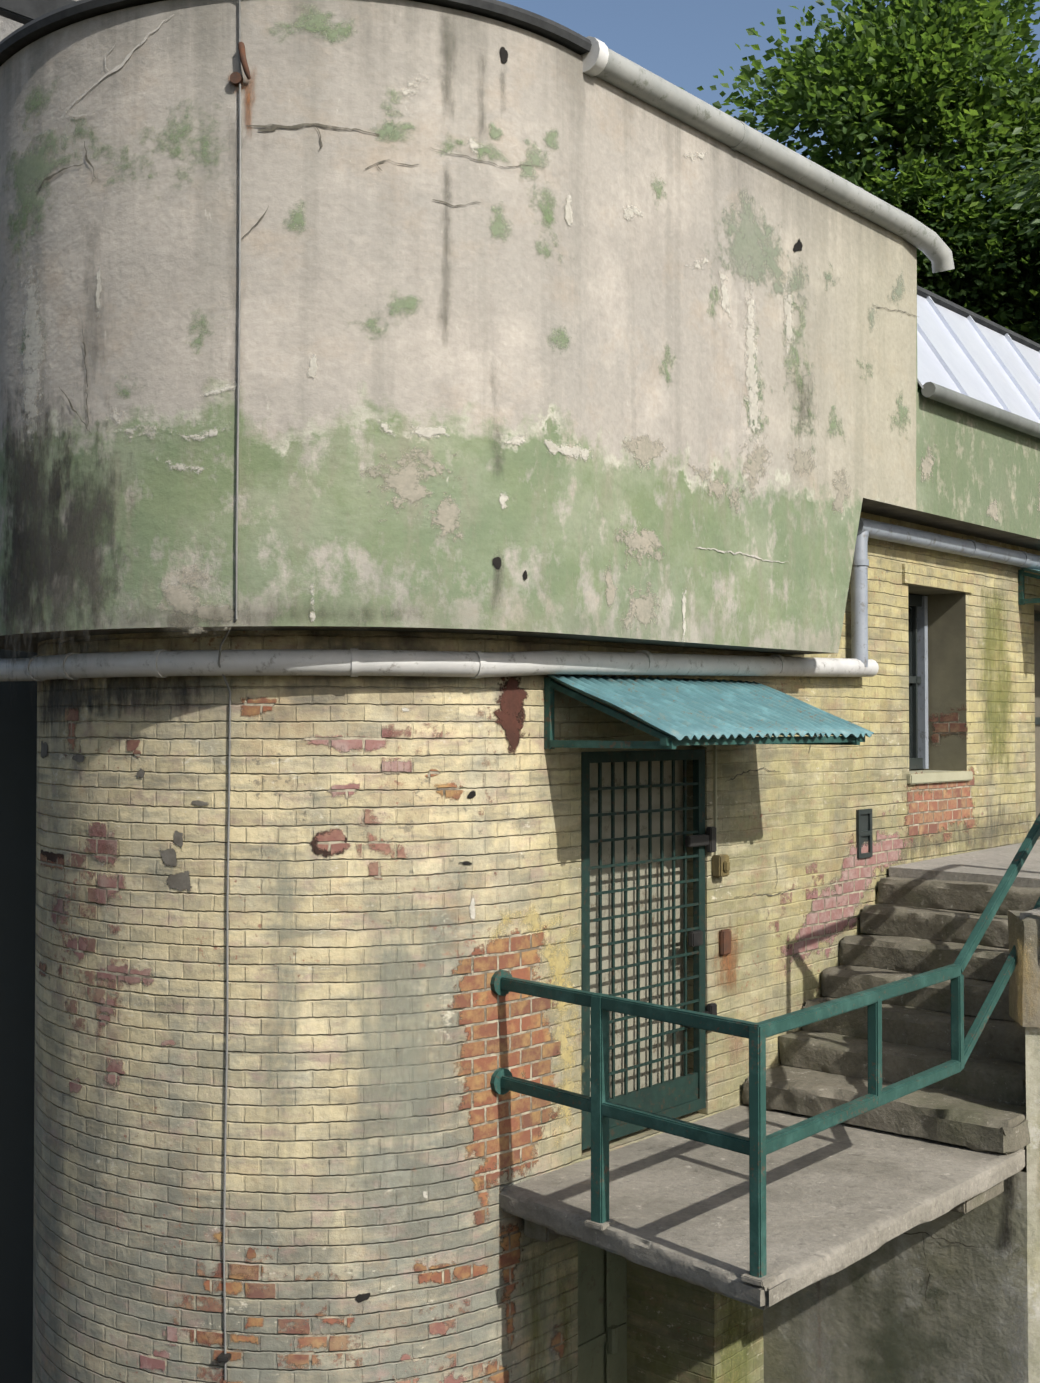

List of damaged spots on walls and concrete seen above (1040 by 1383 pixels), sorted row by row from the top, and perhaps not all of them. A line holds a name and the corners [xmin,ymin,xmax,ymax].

crack [38,14,174,191]
corrosion [230,81,251,127]
crack [246,123,544,170]
water stain [4,412,117,652]
peeling [362,425,463,542]
flaking render [301,708,492,815]
spalling [478,676,530,764]
flaking render [39,822,154,1039]
spalling [310,809,408,880]
flaking render [768,767,988,972]
flaking render [414,927,561,1383]
flaking render [137,1247,370,1383]